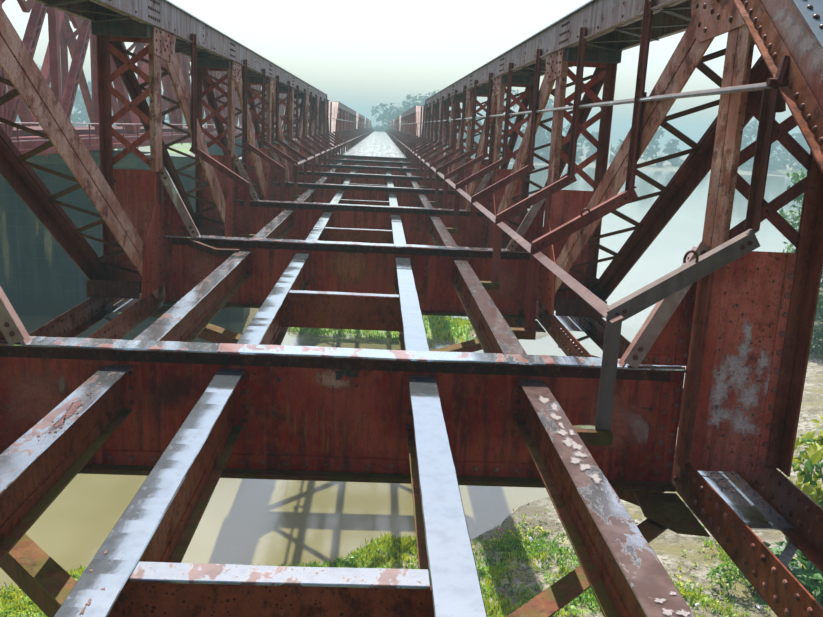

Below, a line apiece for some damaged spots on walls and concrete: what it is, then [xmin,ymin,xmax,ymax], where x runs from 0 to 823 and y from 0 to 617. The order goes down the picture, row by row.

peeling [318,369,359,388]
peeling [710,304,773,441]
peeling [37,392,92,441]
peeling [539,396,601,483]
peeling [655,591,690,617]